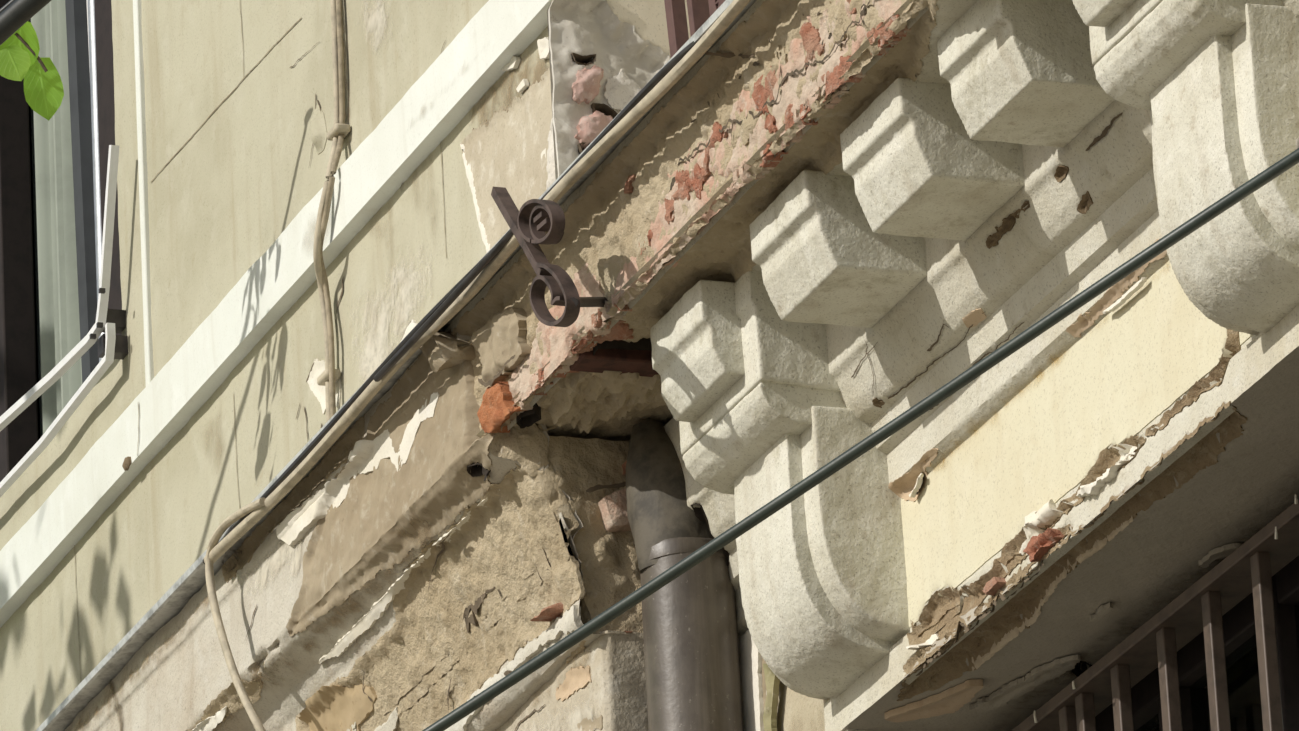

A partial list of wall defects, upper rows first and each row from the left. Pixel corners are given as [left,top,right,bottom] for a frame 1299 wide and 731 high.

crack [705,51,754,59]
crack [1085,113,1122,151]
spalling [986,201,1030,249]
spalling [962,308,987,328]
spalling [222,0,939,731]
crack [851,312,1024,399]
spalling [884,401,1247,722]
spalling [188,672,263,731]